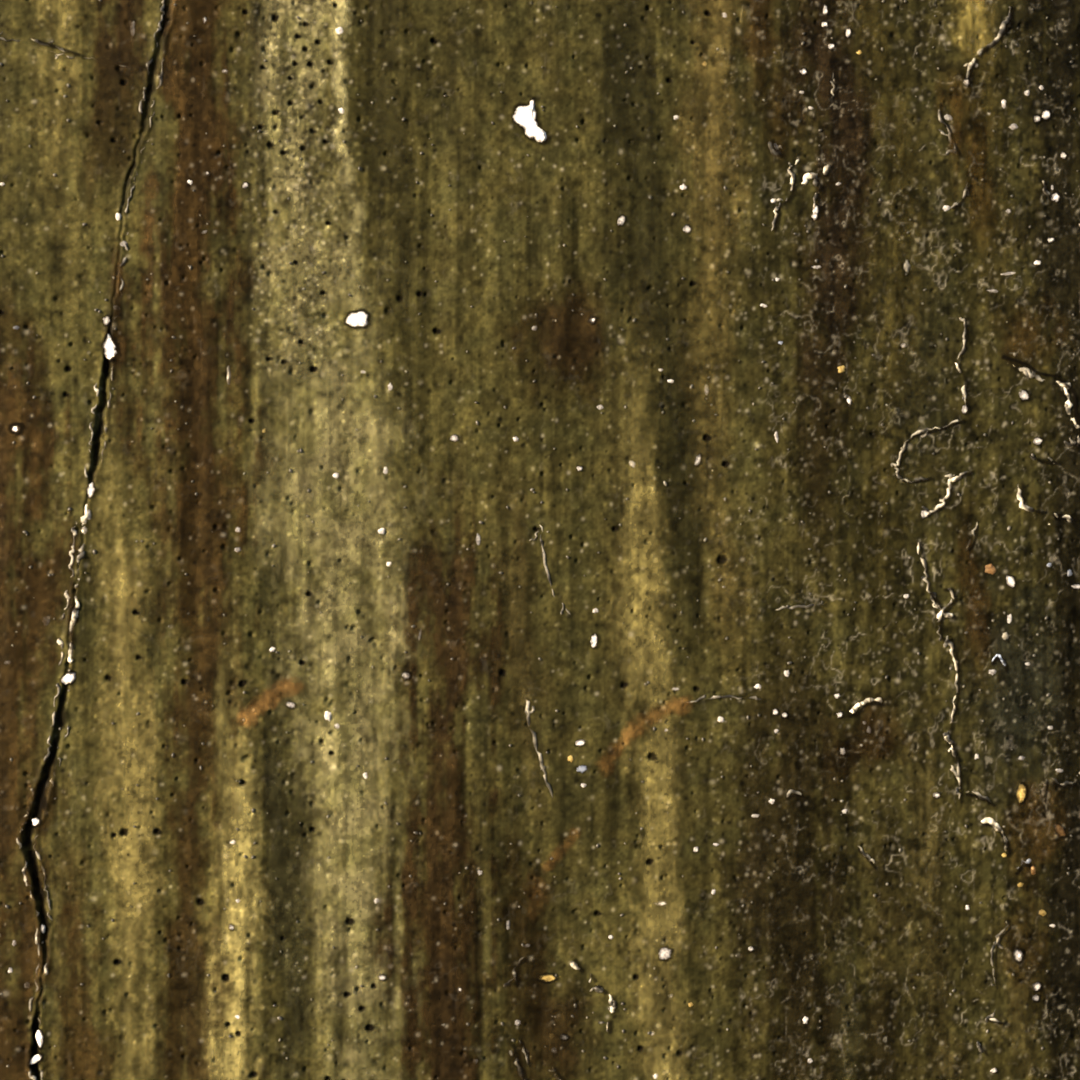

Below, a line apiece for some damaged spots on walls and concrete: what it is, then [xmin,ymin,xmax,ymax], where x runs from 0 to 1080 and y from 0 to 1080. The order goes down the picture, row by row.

crack [16,315,120,1080]
crack [0,0,165,290]
damp [95,529,163,1080]
damp [201,0,438,1080]
damp [601,0,708,1080]
damp [721,681,913,1080]
damp [784,0,877,482]
crack [891,317,973,515]
crack [917,542,962,803]
crack [964,6,1014,86]
crack [1002,355,1080,525]
damp [1013,0,1080,1080]